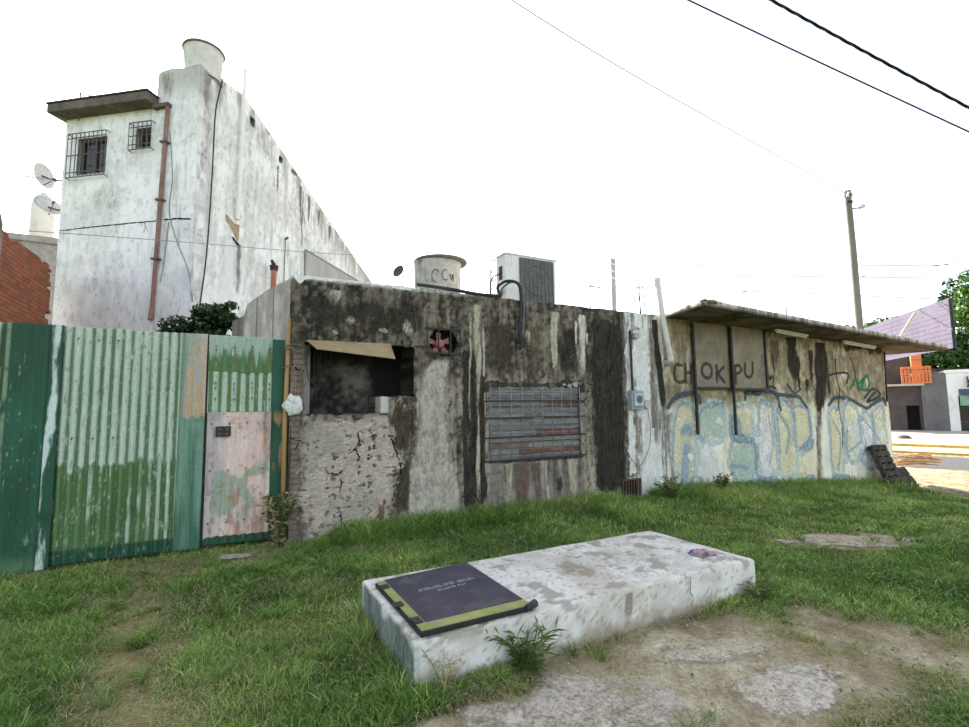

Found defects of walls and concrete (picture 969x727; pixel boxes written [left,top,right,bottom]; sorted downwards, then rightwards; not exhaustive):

water stain [300,187,331,239]
water stain [310,289,422,332]
crack [325,432,364,527]
spalling [291,413,409,542]
crack [391,438,405,475]
water stain [388,408,413,512]
water stain [461,305,511,509]
water stain [505,464,513,506]
water stain [544,458,578,500]
water stain [550,312,678,492]
water stain [786,337,830,481]